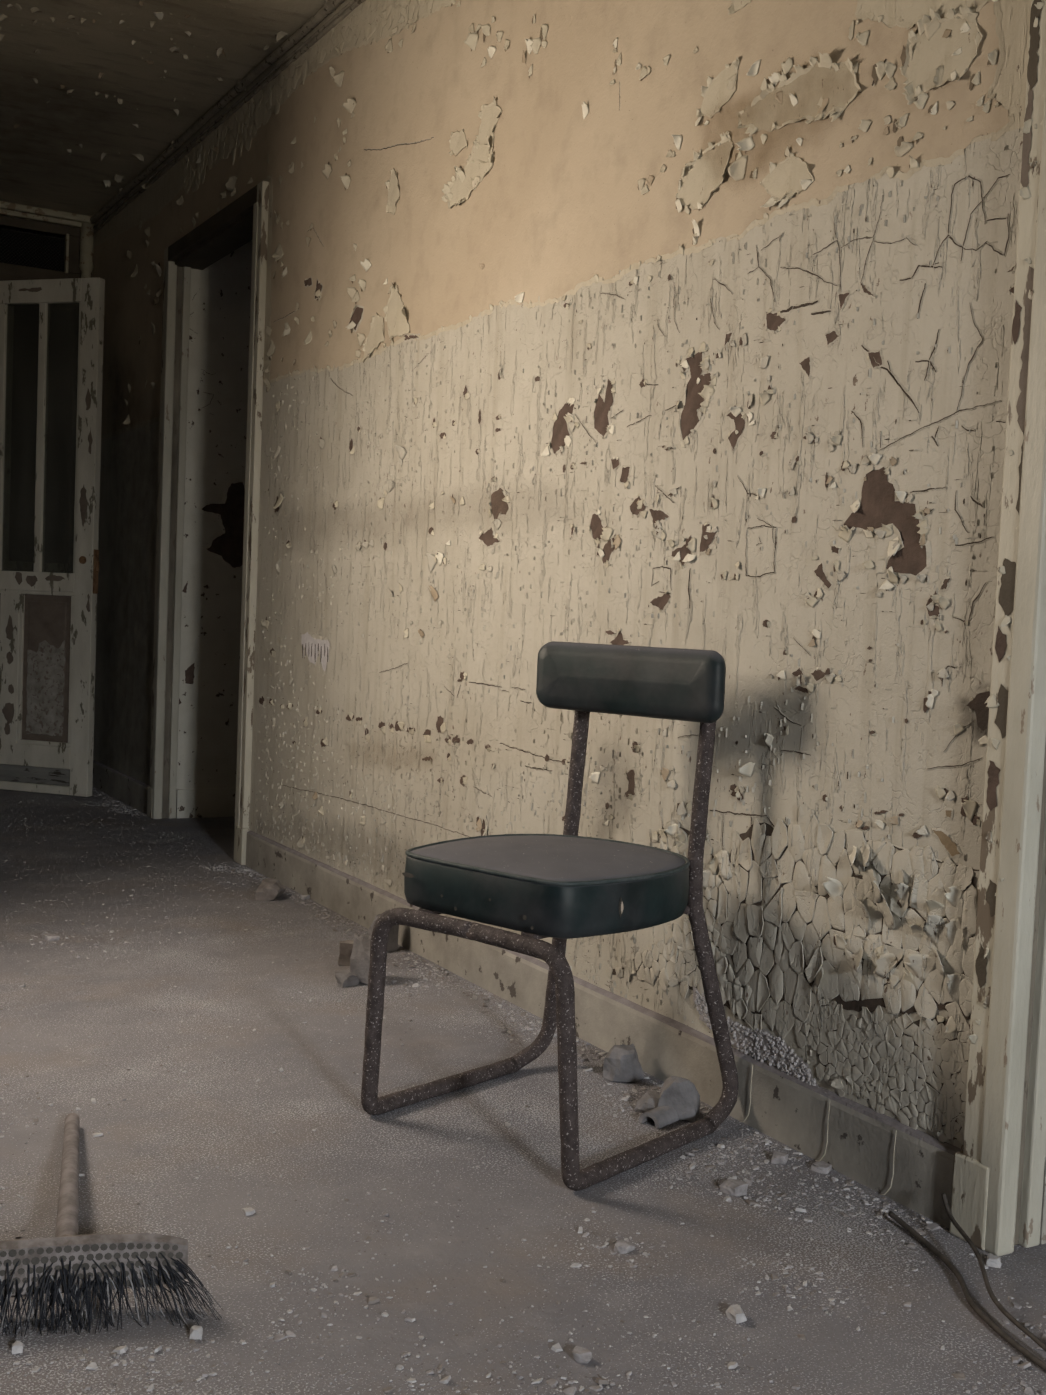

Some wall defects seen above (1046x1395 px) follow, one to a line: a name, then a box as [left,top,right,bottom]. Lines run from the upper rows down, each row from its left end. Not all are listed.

peeling [0,0,420,190]
peeling [637,6,1000,255]
crack [710,174,1011,451]
crack [575,373,676,446]
peeling [198,478,245,572]
crack [737,475,777,579]
spalling [787,431,951,634]
crack [910,487,993,547]
crack [651,565,692,608]
crack [953,583,987,625]
spalling [769,650,842,696]
flaking render [624,762,997,1145]